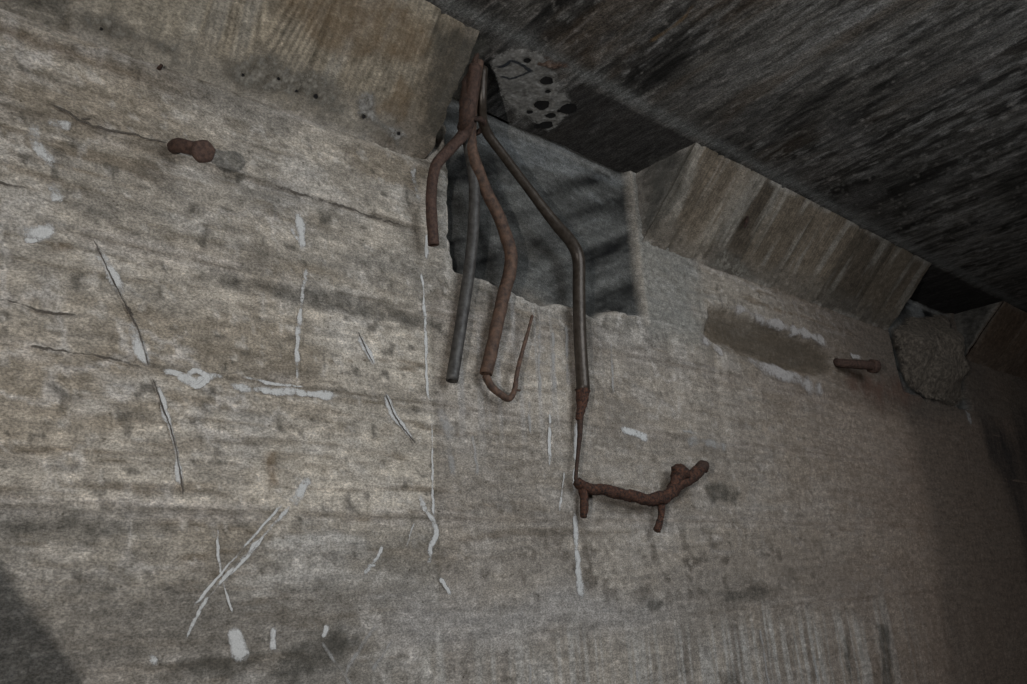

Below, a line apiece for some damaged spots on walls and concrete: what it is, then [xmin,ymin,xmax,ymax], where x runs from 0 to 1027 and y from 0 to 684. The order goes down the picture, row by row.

spalling [491,48,577,131]
crack [53,105,166,143]
crack [278,187,405,227]
crack [8,300,75,315]
corrosion [573,416,709,533]